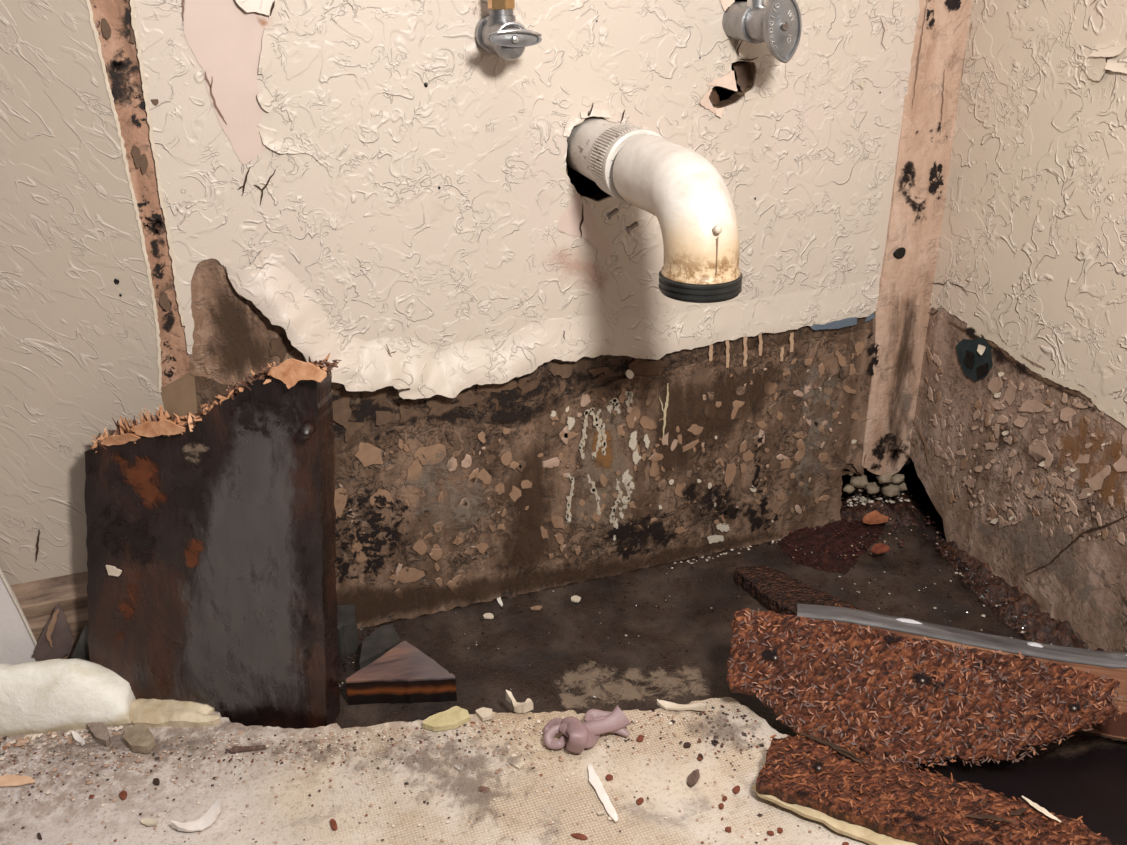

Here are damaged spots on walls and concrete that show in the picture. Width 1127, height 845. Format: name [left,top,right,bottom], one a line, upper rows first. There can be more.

mould [86,0,191,393]
damp [332,362,782,622]
peeling [182,0,1127,653]
damp [956,327,1030,381]